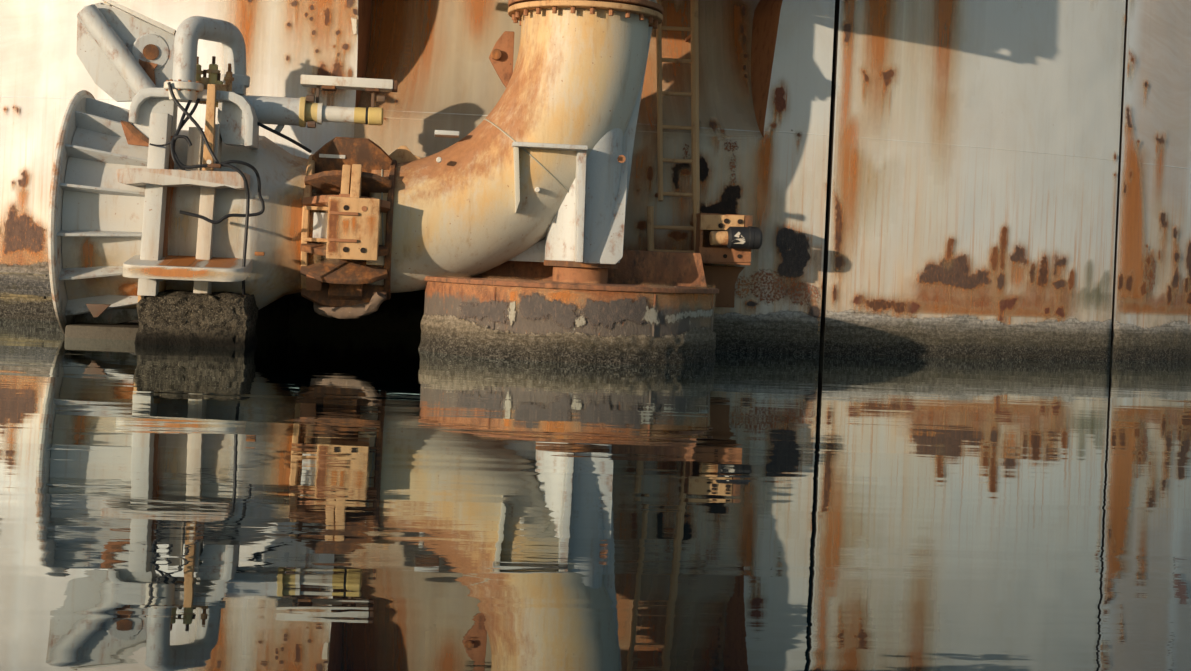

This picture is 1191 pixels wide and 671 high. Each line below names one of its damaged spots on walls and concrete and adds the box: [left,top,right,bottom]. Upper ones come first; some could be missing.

rust [235,0,254,49]
rust [286,0,352,106]
rust [366,0,436,120]
rust [640,0,700,139]
rust [935,0,954,79]
rust [0,170,46,266]
rust [283,185,314,269]
rust [328,199,374,255]
rust [671,154,743,215]
rust [735,0,890,318]
rust [917,226,1074,316]
rust [1114,106,1191,323]